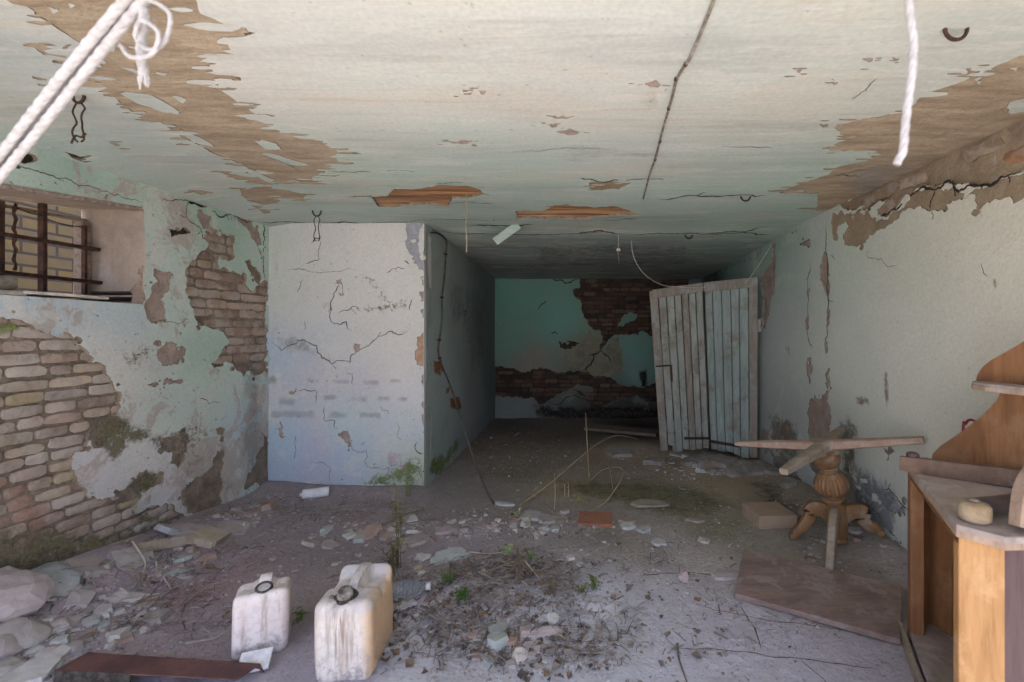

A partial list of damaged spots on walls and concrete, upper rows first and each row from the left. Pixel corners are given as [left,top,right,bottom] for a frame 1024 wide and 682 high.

peeling [9,0,116,63]
peeling [83,0,352,213]
peeling [771,55,1024,250]
crack [881,171,1023,219]
spalling [0,317,224,569]
spalling [130,190,270,375]
spalling [244,436,268,489]
crack [298,389,425,474]
crack [17,166,768,409]
spalling [495,279,694,409]
spalling [808,371,832,439]
leakage [841,424,893,531]